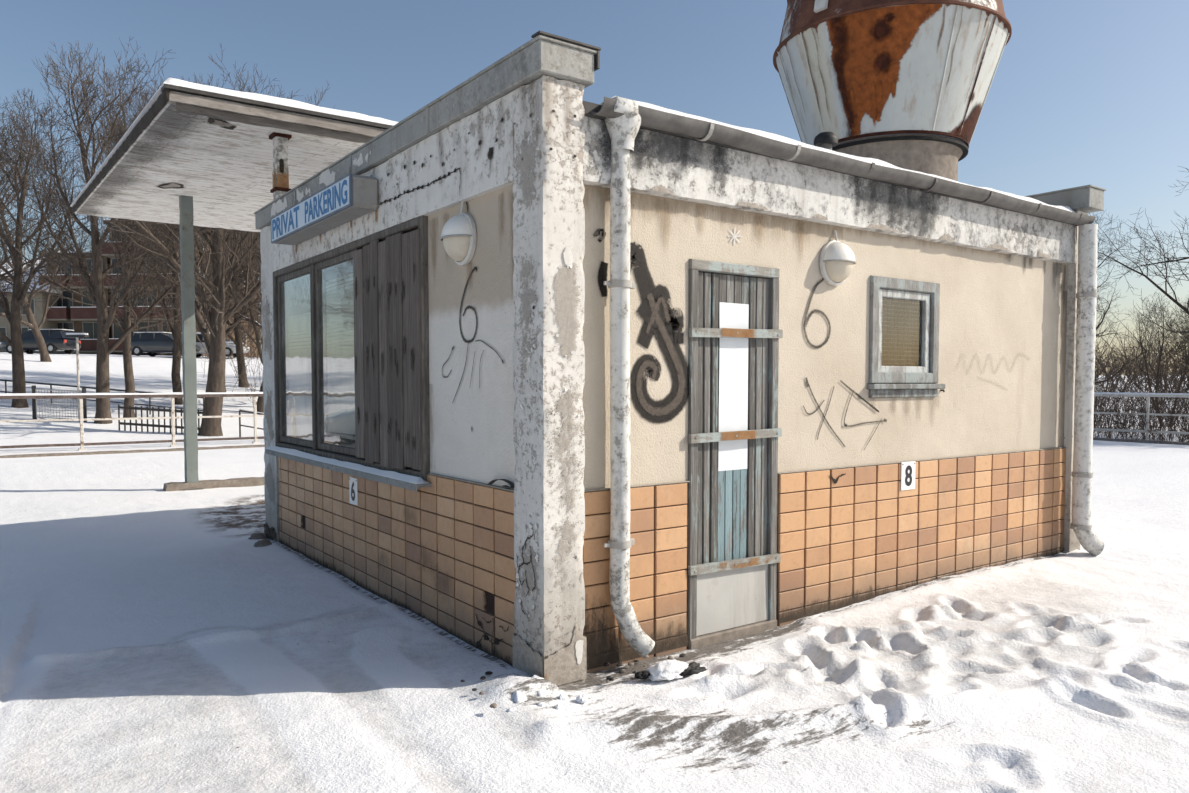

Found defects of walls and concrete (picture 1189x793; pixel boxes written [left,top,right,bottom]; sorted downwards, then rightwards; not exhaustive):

rust [801,4,945,137]
rust [957,93,982,144]
rust [272,159,289,188]
peeling [271,169,339,217]
peeling [353,150,372,177]
water stain [855,176,937,236]
peeling [515,384,583,617]
spalling [483,591,495,615]
spalling [513,624,587,686]